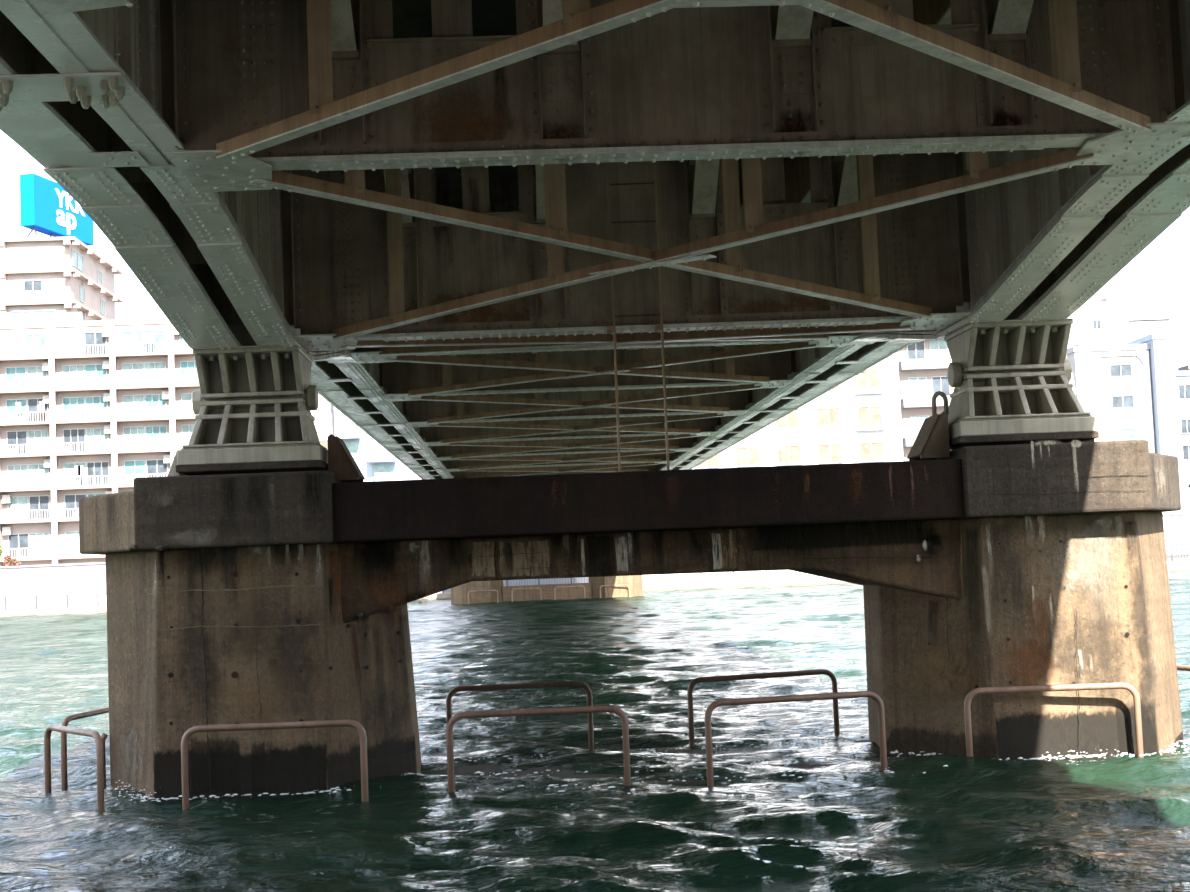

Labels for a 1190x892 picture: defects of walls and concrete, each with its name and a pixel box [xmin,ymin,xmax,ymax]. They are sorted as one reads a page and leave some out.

efflorescence [1071,440,1081,483]
damp [148,529,322,602]
damp [409,541,429,571]
damp [555,533,639,576]
damp [691,531,737,569]
damp [753,520,932,552]
damp [966,526,1035,636]
damp [996,517,1159,761]
damp [153,735,417,801]